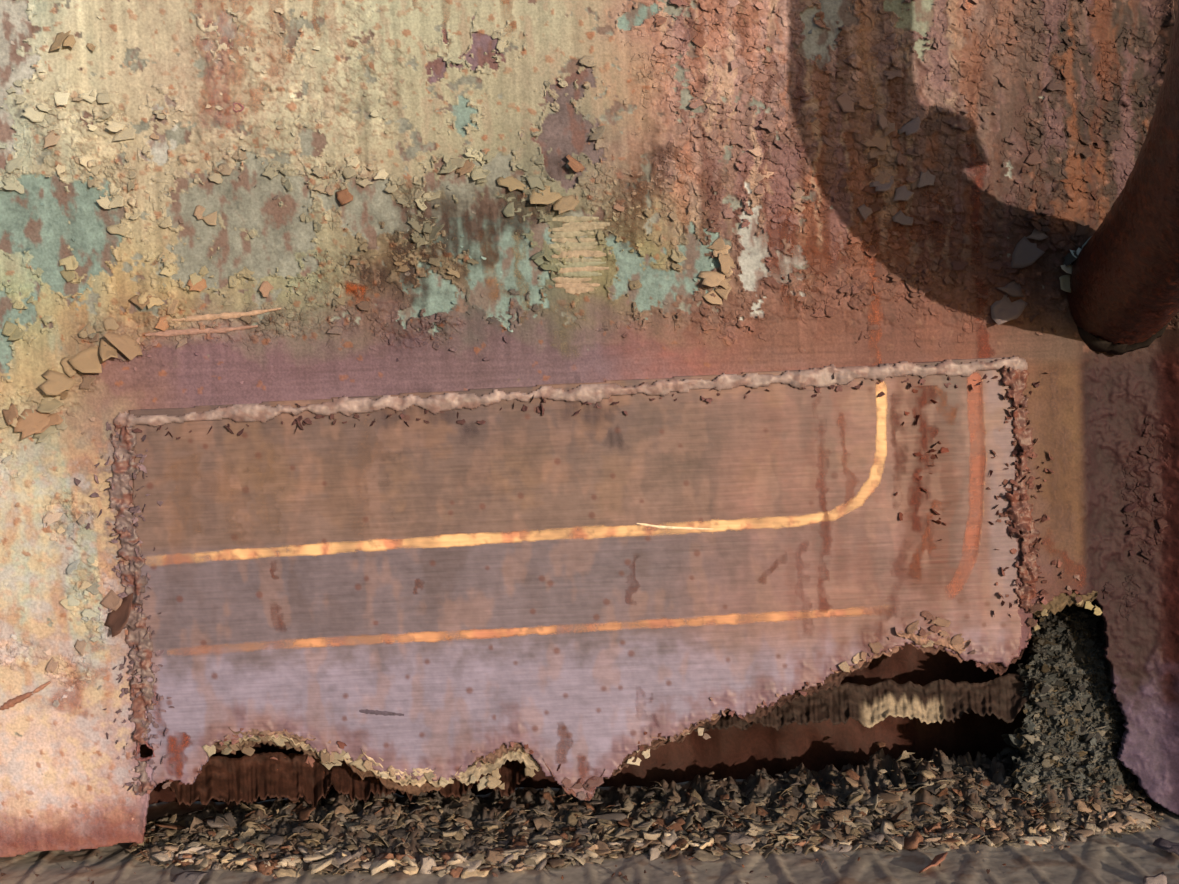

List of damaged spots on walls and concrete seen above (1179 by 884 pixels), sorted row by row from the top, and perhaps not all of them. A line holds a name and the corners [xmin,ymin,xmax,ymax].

peeling [953,0,1149,325]
peeling [0,0,984,494]
rust [911,386,937,566]
peeling [38,487,104,547]
peeling [0,555,134,708]
peeling [1027,609,1048,631]
peeling [838,641,884,672]
peeling [202,731,397,779]
peeling [410,768,505,791]
peeling [513,747,536,777]
peeling [561,776,604,800]
peeling [627,749,650,766]